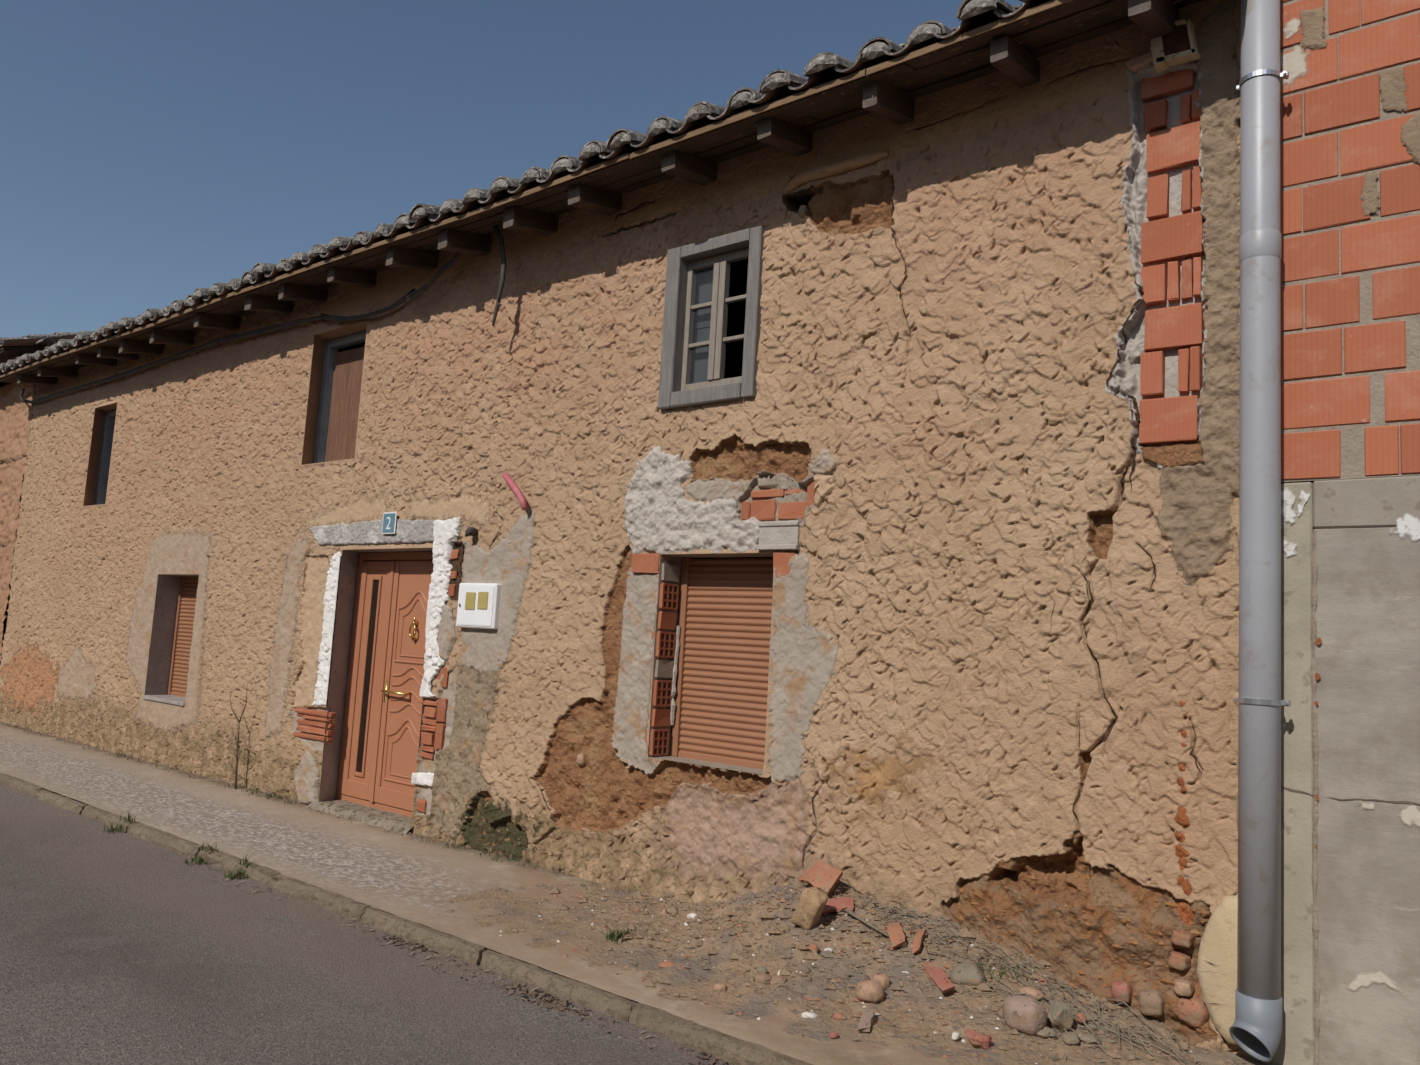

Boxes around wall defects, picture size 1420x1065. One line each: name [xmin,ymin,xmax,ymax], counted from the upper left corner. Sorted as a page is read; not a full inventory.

crack [603,199,675,237]
flaking render [782,150,895,235]
crack [891,190,911,354]
flaking render [1105,51,1209,469]
flaking render [689,434,835,526]
crack [1106,274,1145,506]
flaking render [411,517,465,816]
flaking render [534,545,772,833]
crack [1045,561,1117,749]
flaking render [462,791,527,851]
flaking render [941,831,1217,1045]